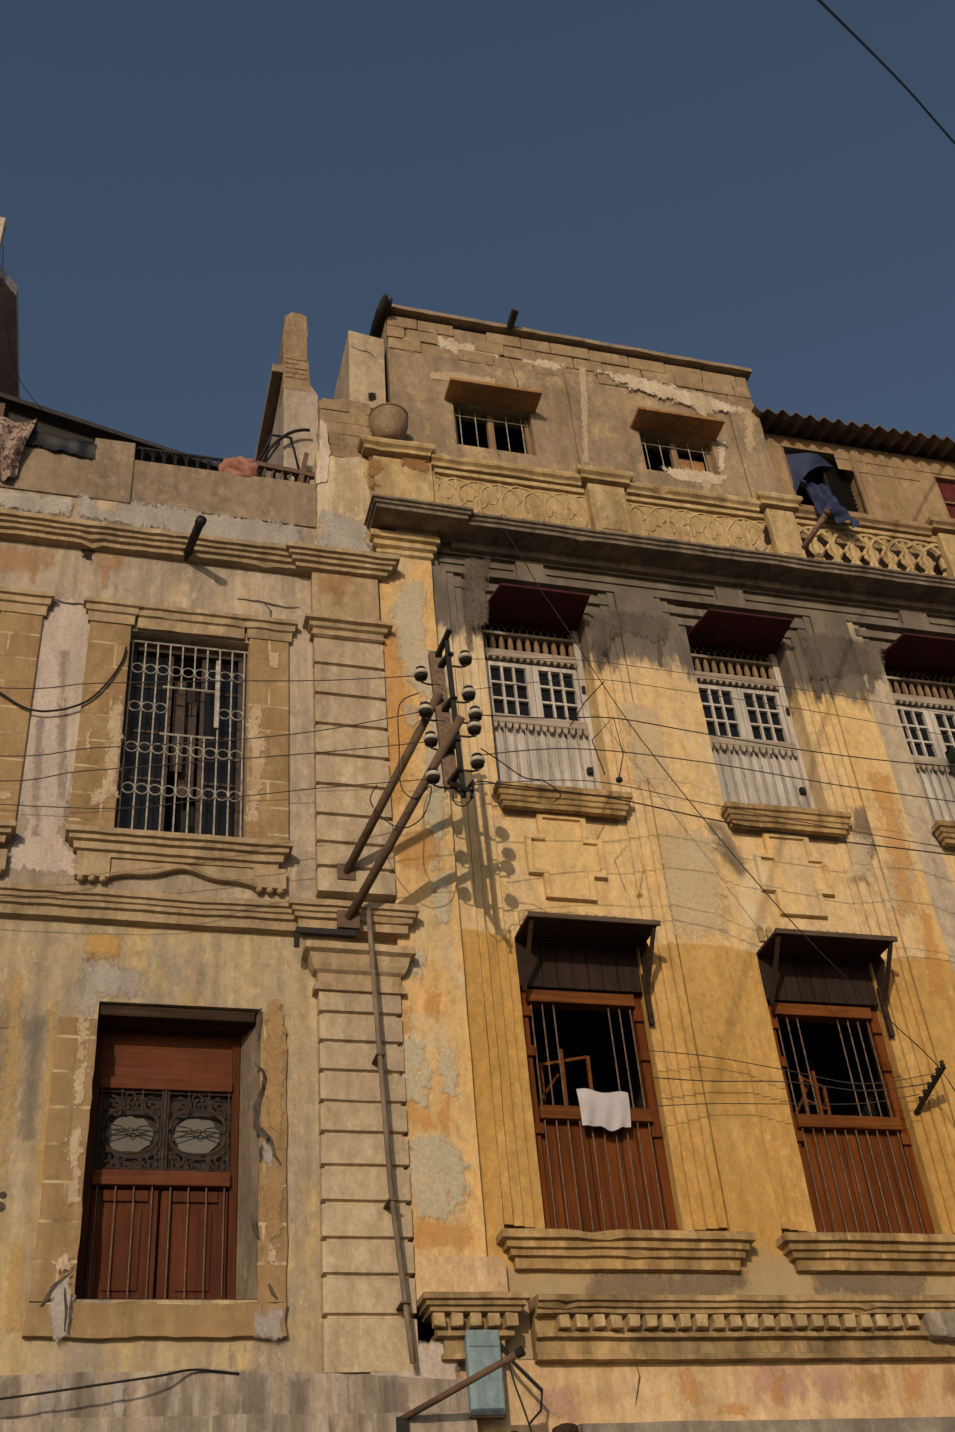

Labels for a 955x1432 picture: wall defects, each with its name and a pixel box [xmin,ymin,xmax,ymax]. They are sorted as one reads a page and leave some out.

peeling [595,369,755,455]
peeling [660,441,731,492]
peeling [407,950,427,979]
peeling [61,959,143,1208]
crack [253,1008,282,1165]
peeling [396,1034,460,1107]
peeling [408,1133,474,1220]
crack [250,1215,260,1238]
spalling [49,1248,76,1341]
crack [268,1283,278,1299]